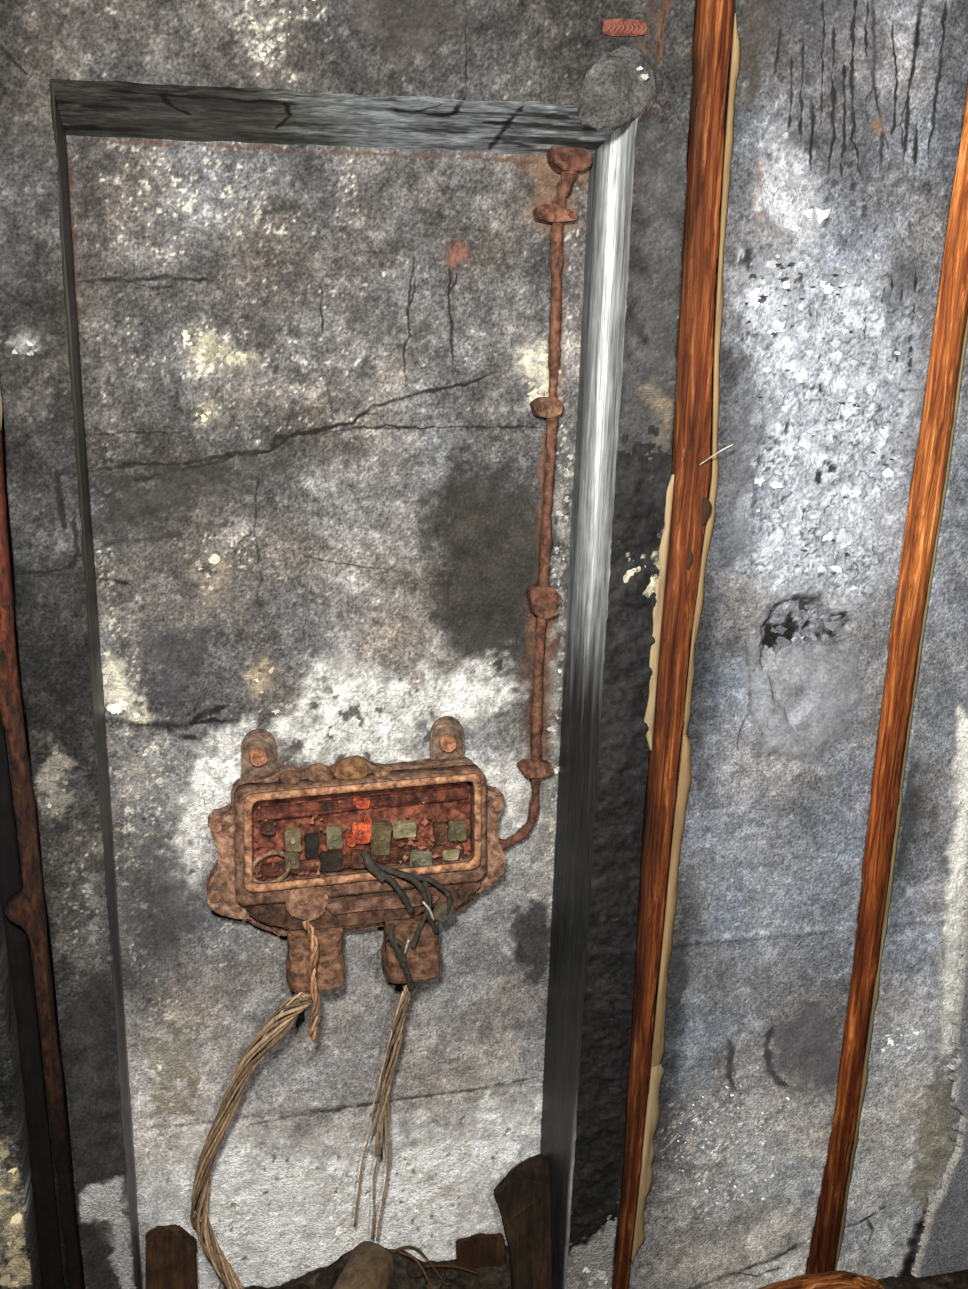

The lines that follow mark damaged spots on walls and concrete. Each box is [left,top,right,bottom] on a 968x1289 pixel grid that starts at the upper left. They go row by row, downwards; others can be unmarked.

crack [867,4,921,161]
crack [85,243,540,557]
corrosion [447,241,469,267]
spalling [737,132,922,668]
leakage [128,472,540,939]